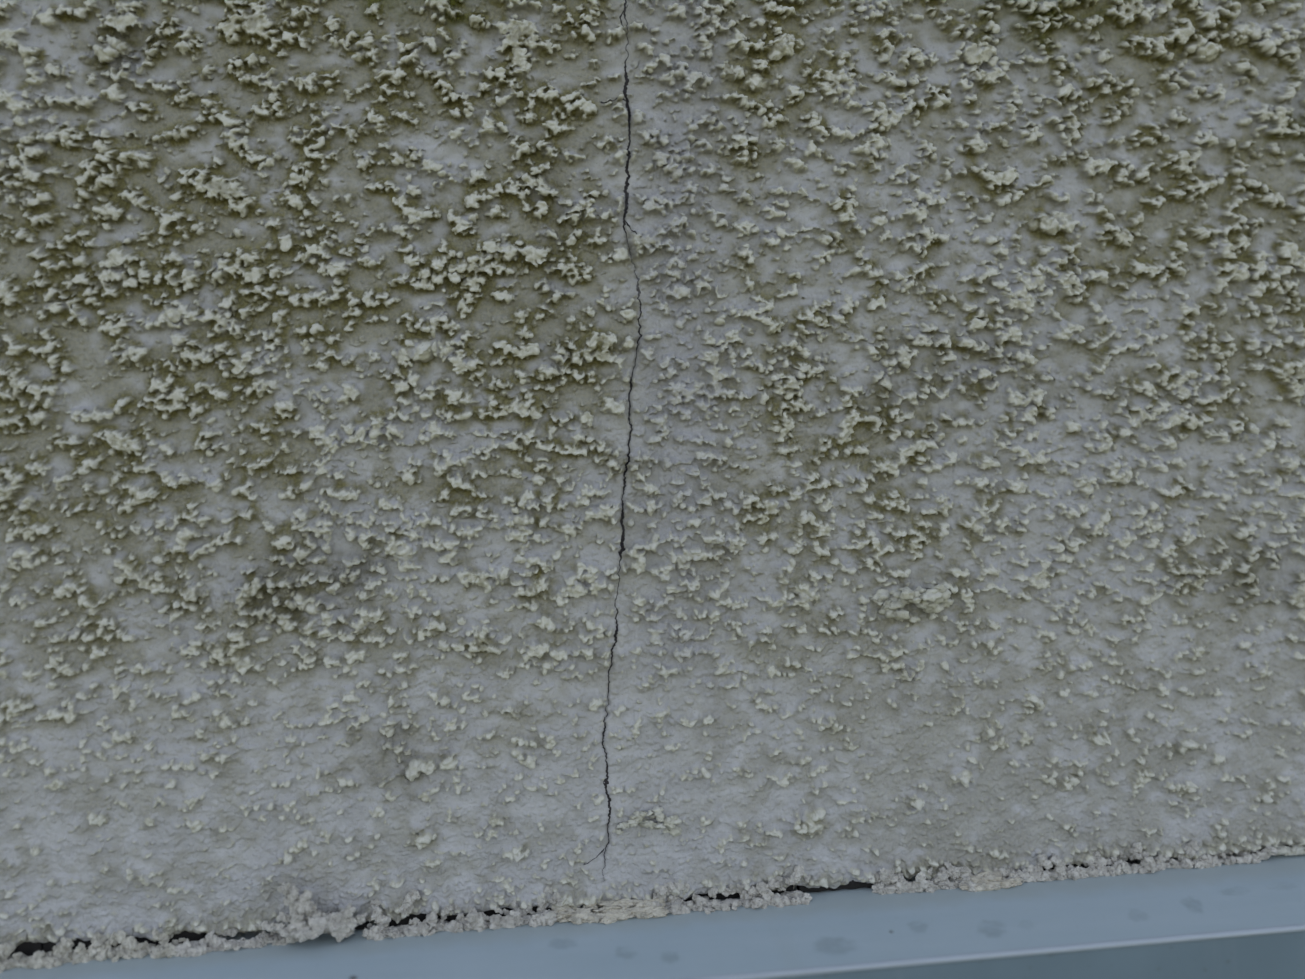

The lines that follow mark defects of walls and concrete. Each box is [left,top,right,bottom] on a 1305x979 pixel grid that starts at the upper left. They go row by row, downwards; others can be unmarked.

crack [584,0,642,882]